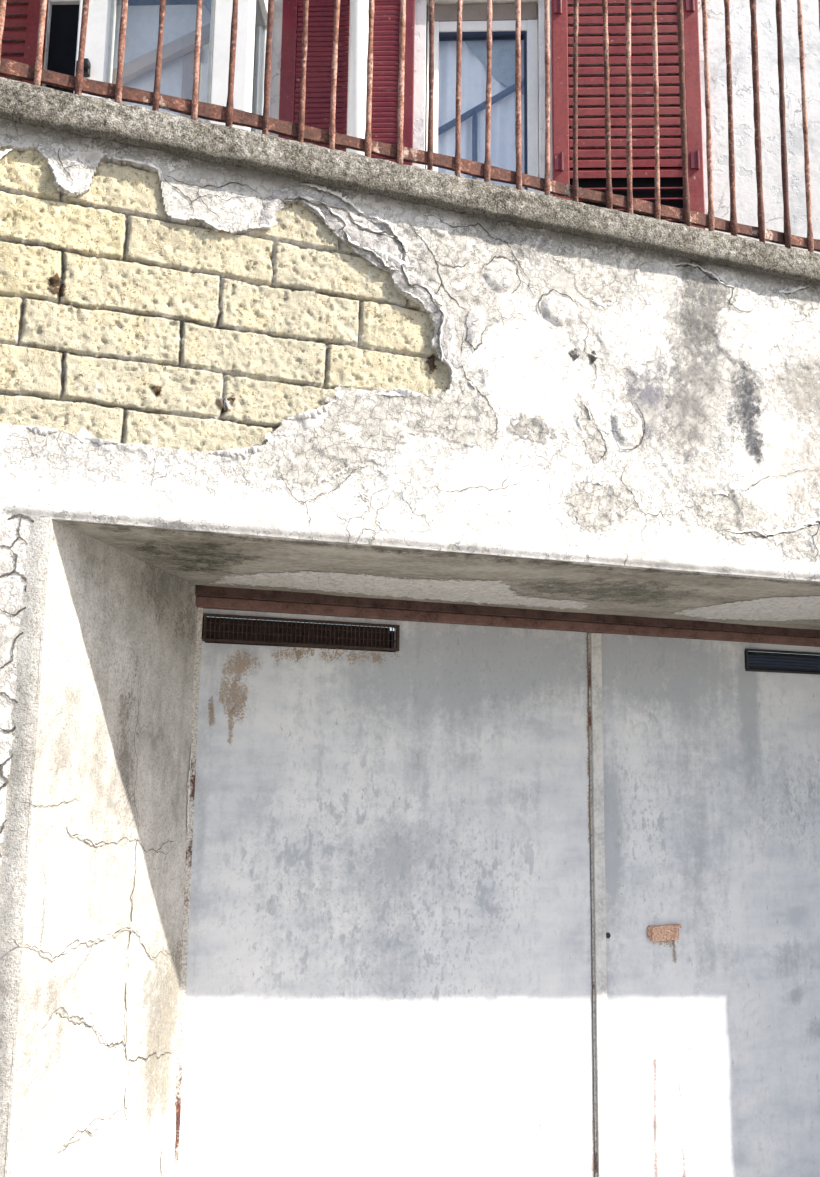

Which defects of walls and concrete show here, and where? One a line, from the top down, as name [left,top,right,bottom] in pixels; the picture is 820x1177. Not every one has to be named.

spalling [49,162,79,194]
spalling [113,157,162,180]
spalling [47,273,67,297]
peeling [210,182,557,492]
spalling [77,428,118,445]
leakage [731,363,773,462]
crack [278,466,366,530]
crack [721,518,820,564]
rust [209,652,257,743]
crack [0,514,180,1154]